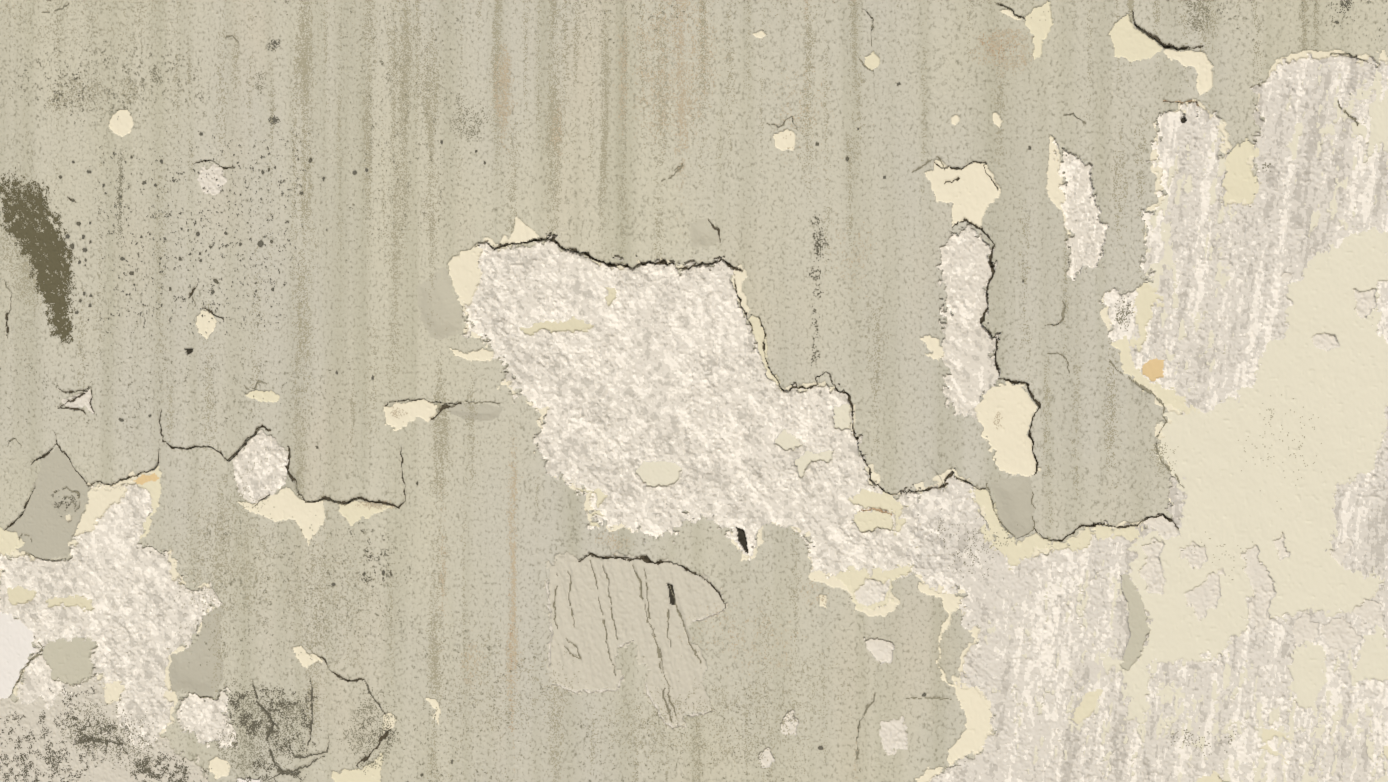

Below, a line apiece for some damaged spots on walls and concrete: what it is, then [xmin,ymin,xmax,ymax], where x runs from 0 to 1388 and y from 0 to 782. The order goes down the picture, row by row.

peeling [773,129,796,151]
peeling [1053,139,1109,281]
peeling [1099,50,1388,440]
crack [4,386,406,561]
peeling [232,430,289,503]
peeling [457,224,1388,782]
peeling [0,470,238,782]
peeling [293,646,323,669]
crack [252,656,391,777]
peeling [383,712,397,733]